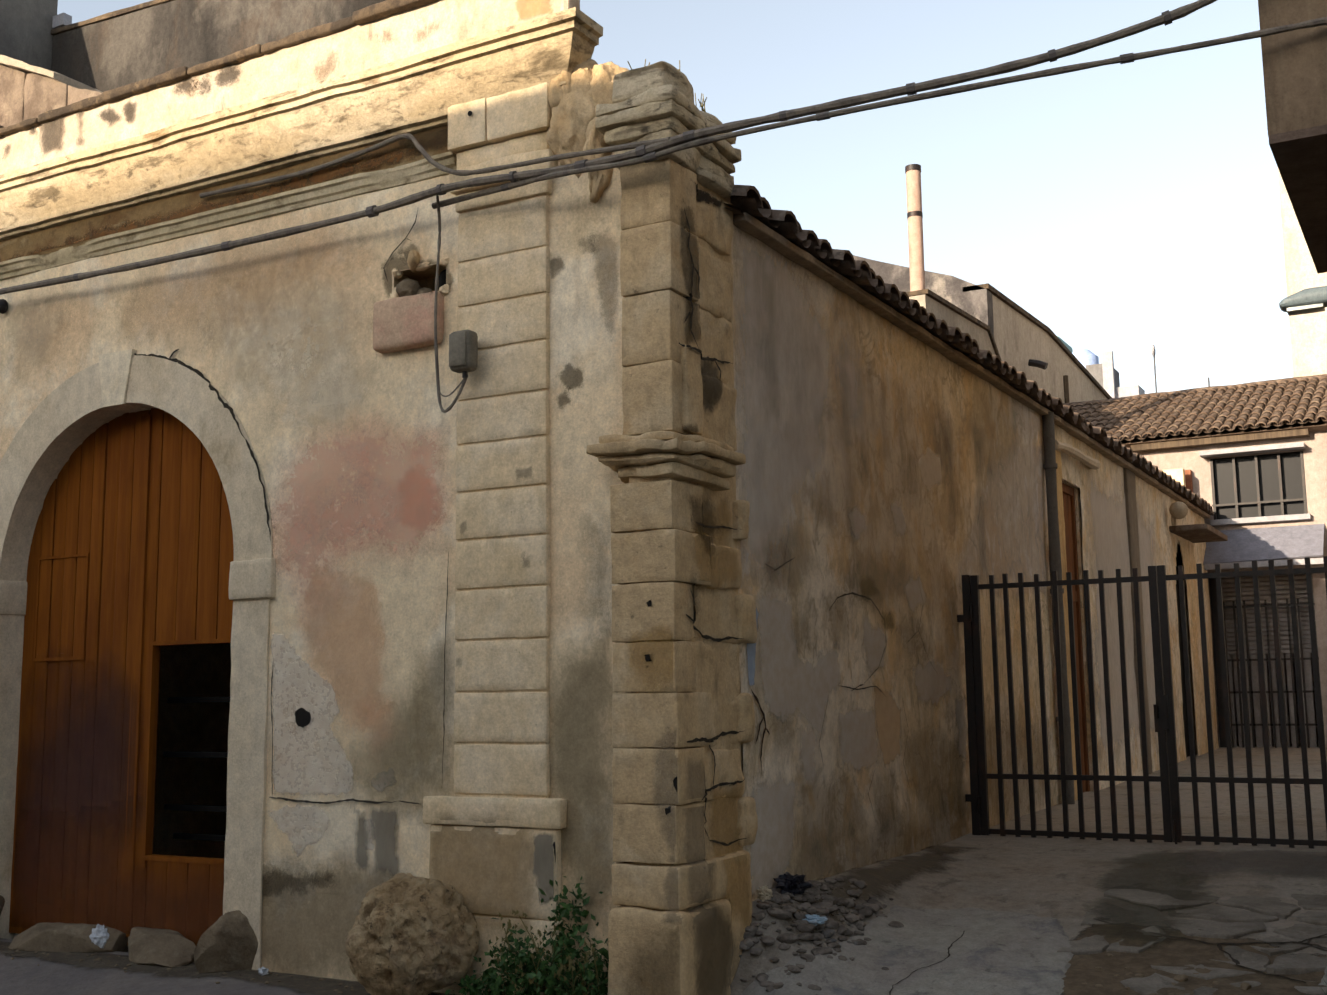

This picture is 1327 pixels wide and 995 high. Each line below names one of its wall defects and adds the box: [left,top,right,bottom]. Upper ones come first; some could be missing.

spalling [546,59,628,203]
spalling [390,250,450,299]
crack [134,349,271,541]
damp [701,361,722,410]
crack [686,589,743,642]
spalling [272,634,353,795]
crack [687,689,770,846]
crack [819,576,938,817]
crack [889,931,965,995]